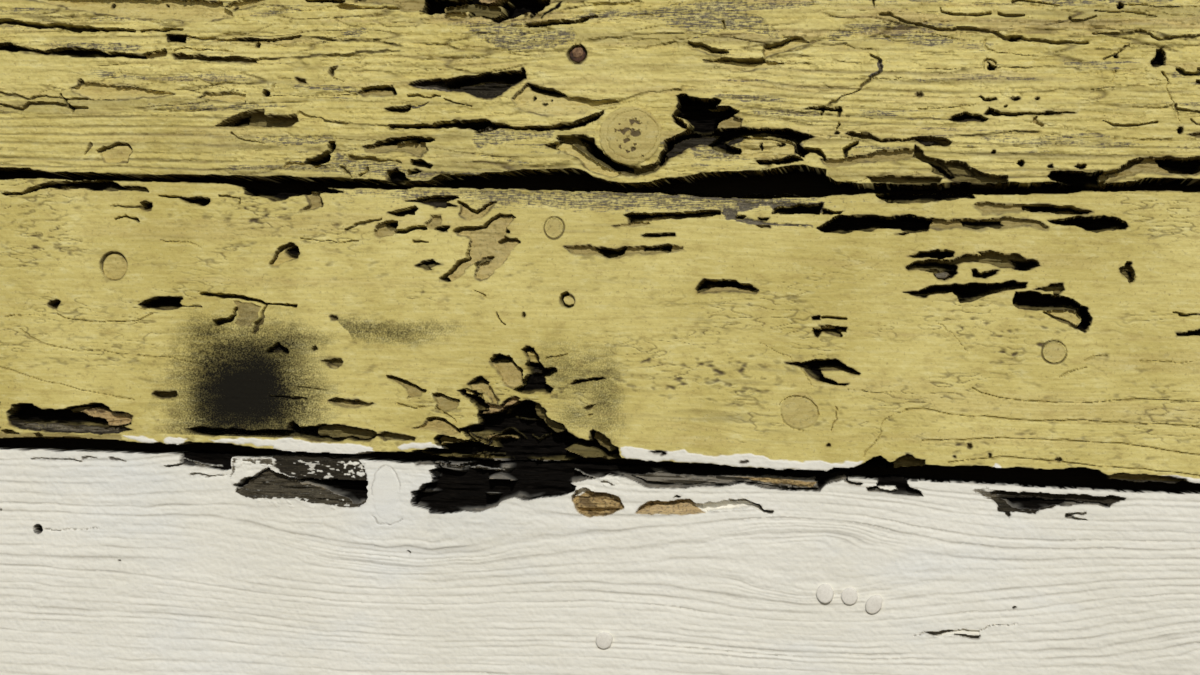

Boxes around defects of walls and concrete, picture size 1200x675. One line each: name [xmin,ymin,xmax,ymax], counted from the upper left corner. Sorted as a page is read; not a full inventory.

peeling [584,19,1088,95]
spalling [70,35,687,127]
spalling [579,139,634,173]
spalling [821,148,955,191]
spalling [1154,158,1200,175]
spalling [928,204,1092,231]
spalling [1010,259,1040,271]
spalling [467,353,525,404]
spalling [385,374,461,436]
peeling [230,453,374,509]
spalling [634,498,774,516]
spalling [1000,496,1110,511]